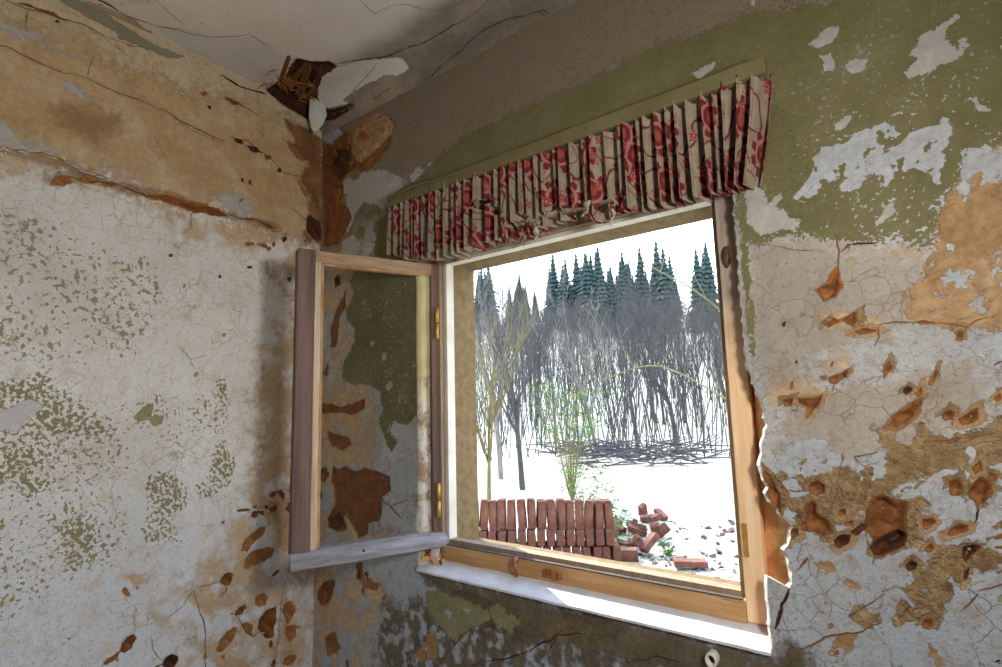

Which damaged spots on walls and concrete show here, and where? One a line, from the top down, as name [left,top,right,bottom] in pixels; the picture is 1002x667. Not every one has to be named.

crack [98,0,488,64]
crack [0,0,305,177]
peeling [60,0,1002,363]
peeling [321,269,417,455]
crack [875,316,989,345]
peeling [0,214,235,618]
flaking render [236,489,290,569]
flaking render [320,467,409,538]
flaking render [203,593,301,659]
crack [775,557,809,629]
crack [789,594,884,654]
crack [960,584,1002,612]